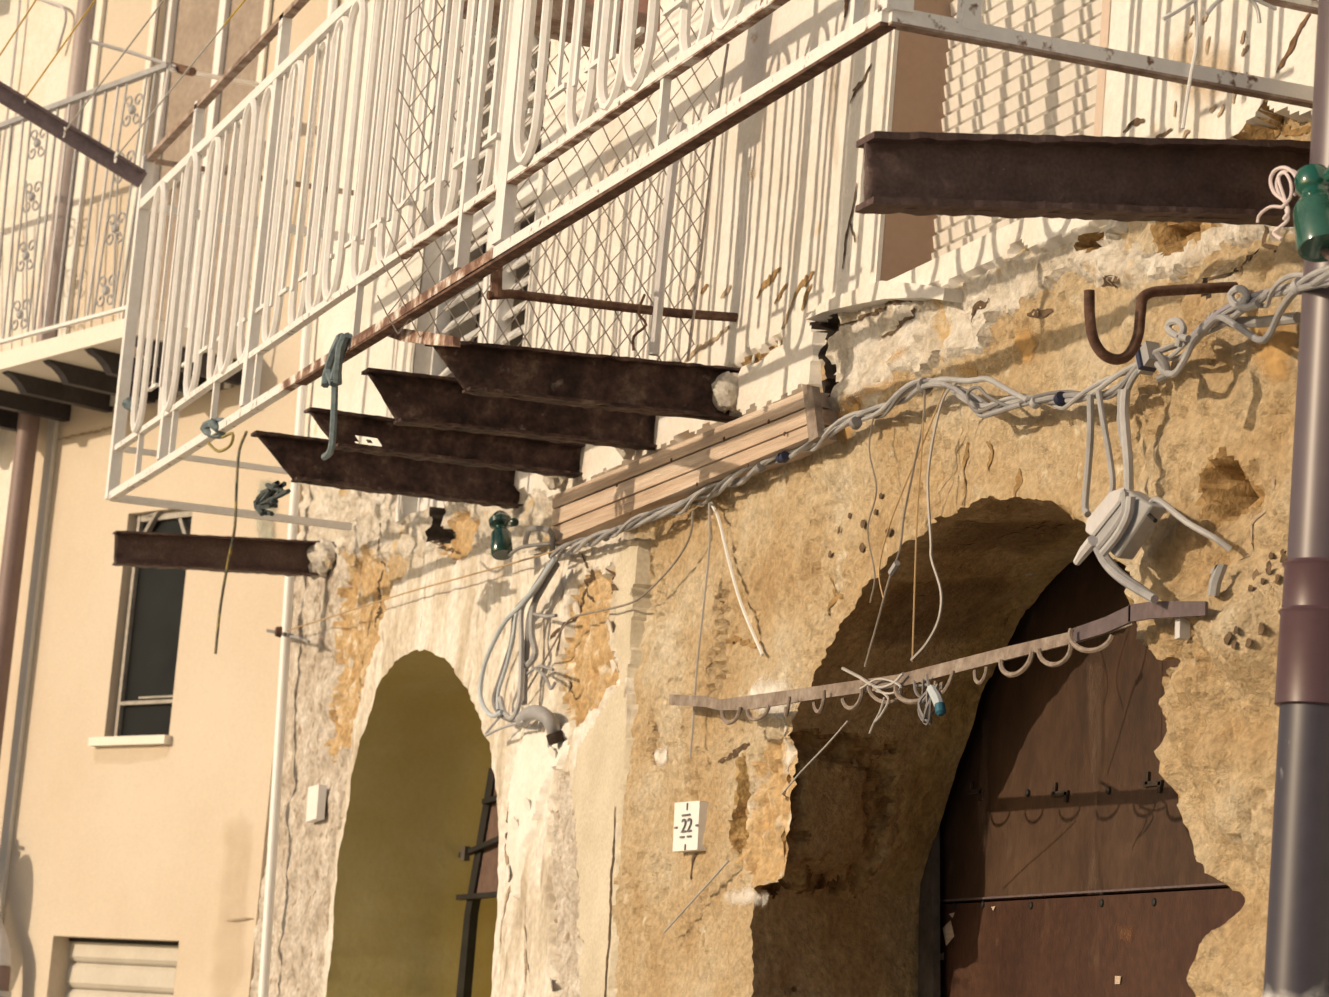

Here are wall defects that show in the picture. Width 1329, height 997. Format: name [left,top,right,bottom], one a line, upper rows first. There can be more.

spalling [1074,232,1104,253]
spalling [1150,221,1217,257]
flaking render [684,325,729,363]
flaking render [733,267,814,374]
spalling [837,493,882,552]
spalling [1194,446,1265,532]
spalling [1248,549,1287,591]
flaking render [324,544,392,763]
spalling [704,586,735,699]
flaking render [505,570,619,997]
spalling [718,728,902,899]
peeling [940,912,955,960]